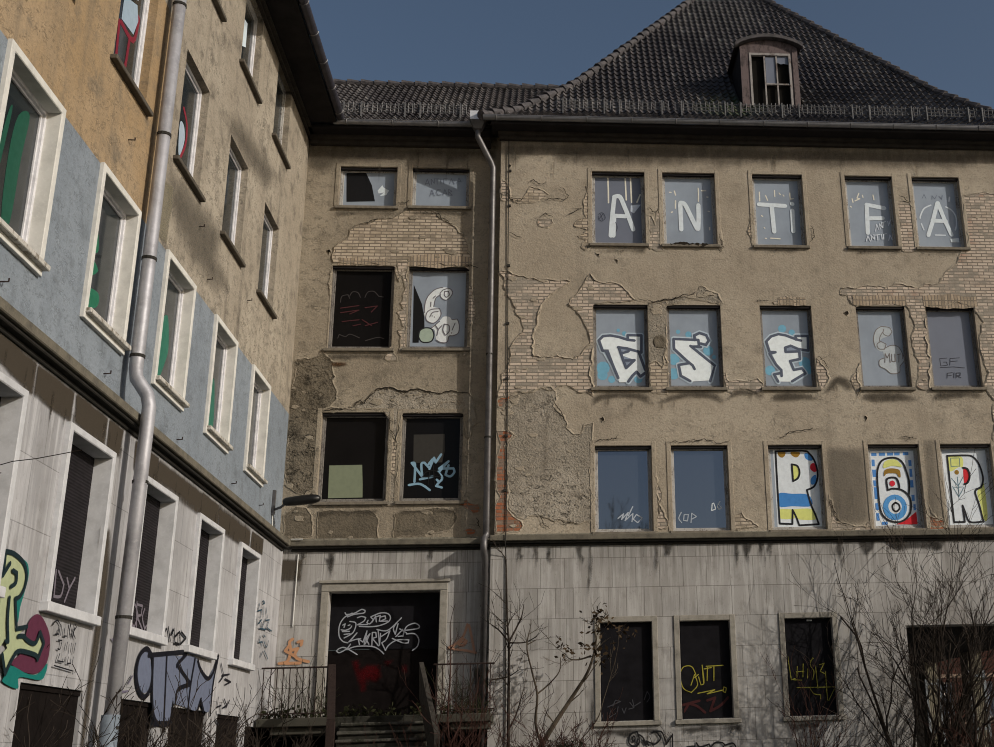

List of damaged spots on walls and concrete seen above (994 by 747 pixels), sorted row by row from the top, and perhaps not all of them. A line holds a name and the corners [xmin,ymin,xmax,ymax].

flaking render [499,179,550,204]
flaking render [647,209,724,252]
water stain [0,333,124,456]
flaking render [282,209,481,540]
spalling [494,270,636,534]
spalling [647,286,724,396]
flaking render [839,191,994,451]
water stain [148,452,264,555]
water stain [281,554,304,581]